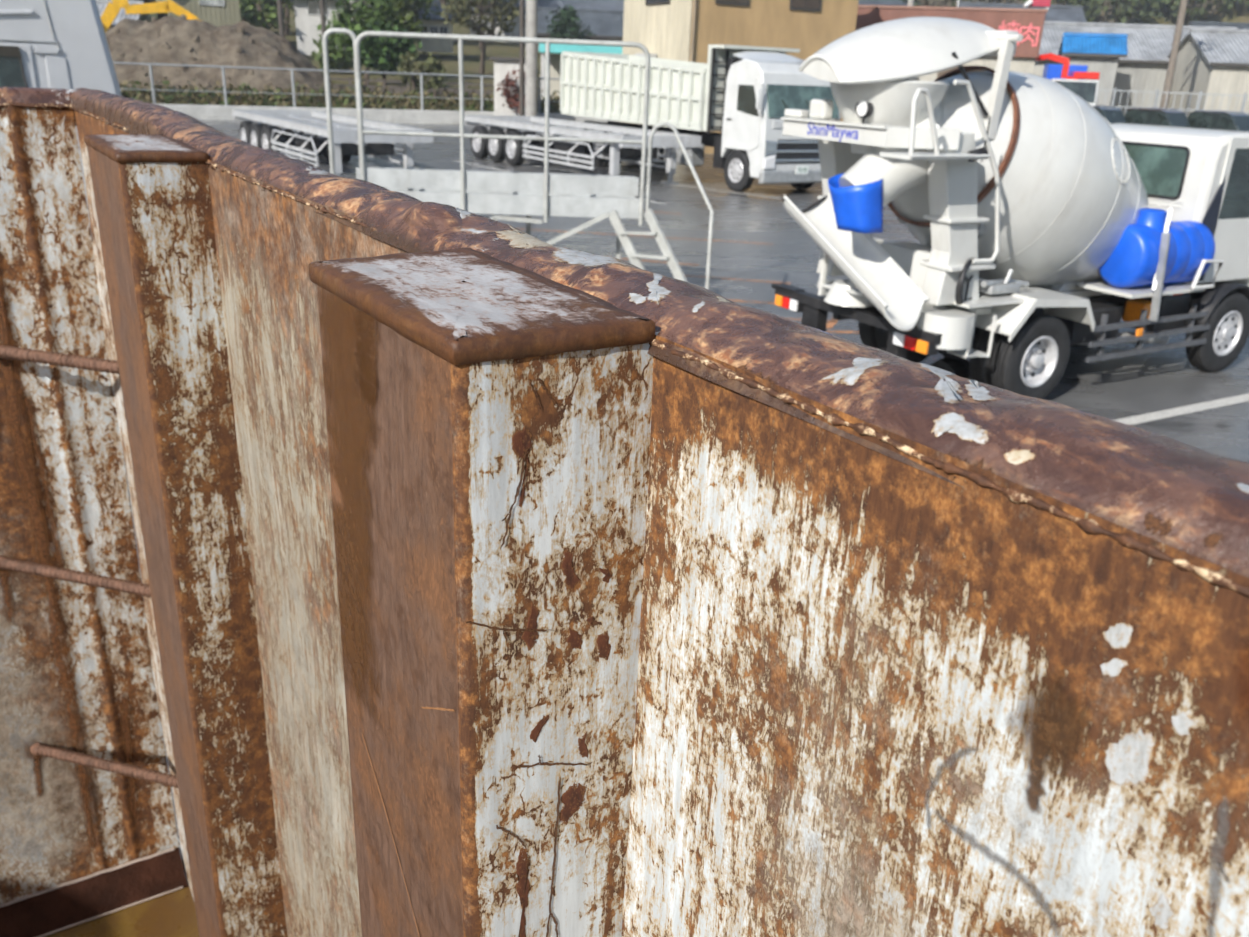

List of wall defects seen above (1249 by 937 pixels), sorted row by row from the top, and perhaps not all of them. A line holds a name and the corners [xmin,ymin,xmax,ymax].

peeling [496,223,629,268]
peeling [628,273,671,305]
peeling [692,296,730,313]
peeling [821,357,889,385]
peeling [919,363,997,445]
peeling [1004,449,1036,465]
corrosion [0,296,94,848]
peeling [1101,623,1133,677]
peeling [1171,712,1194,736]
peeling [1104,727,1155,788]
crack [496,755,588,937]